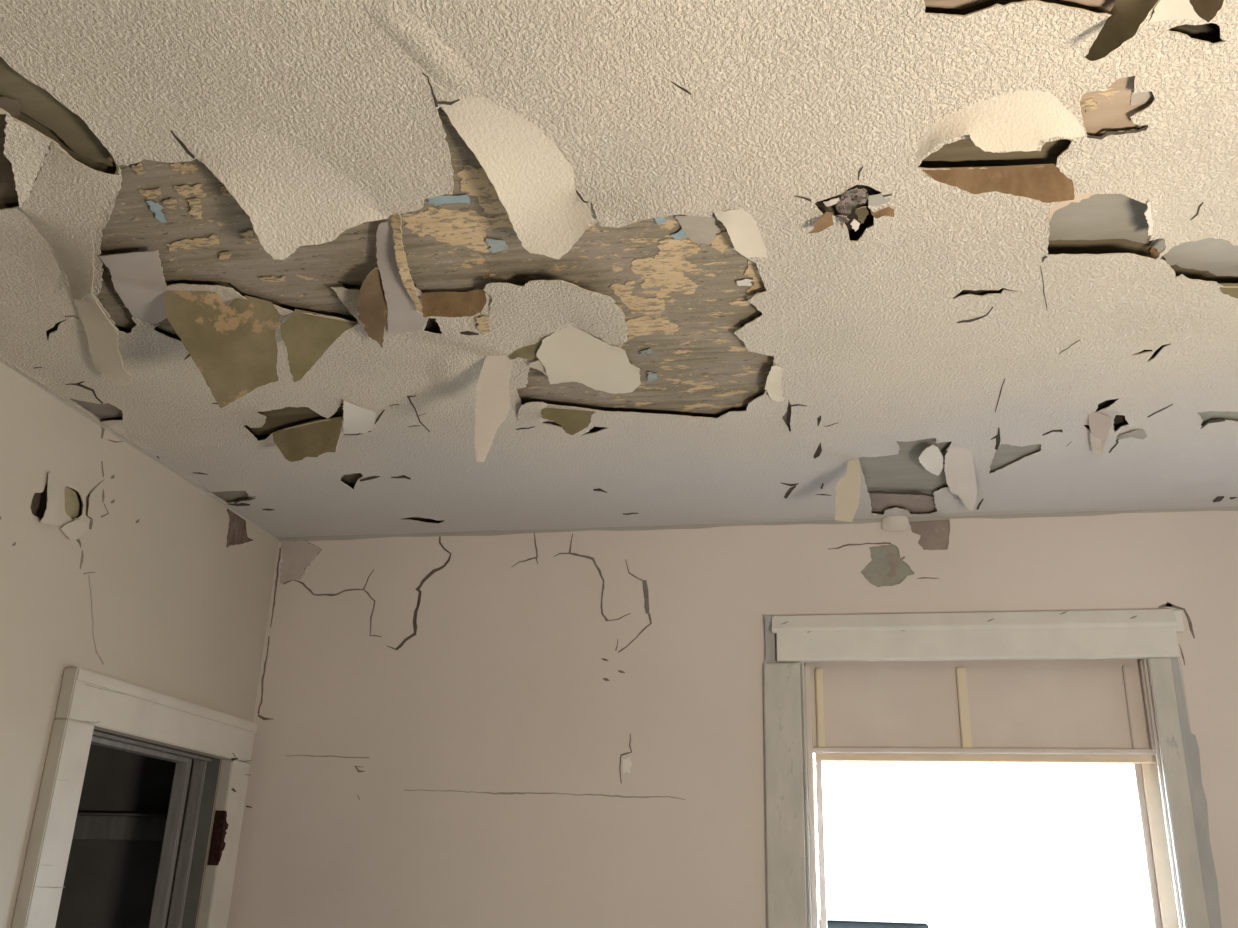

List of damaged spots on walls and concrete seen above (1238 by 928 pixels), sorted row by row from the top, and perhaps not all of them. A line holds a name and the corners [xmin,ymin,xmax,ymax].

peeling [924,0,988,9]
peeling [1065,0,1225,61]
peeling [0,96,20,209]
peeling [97,72,784,462]
peeling [850,193,895,231]
peeling [914,75,1238,299]
peeling [66,381,123,419]
peeling [1197,411,1238,429]
crack [76,426,141,699]
crack [258,517,451,720]
crack [512,533,652,681]
peeling [816,438,983,587]